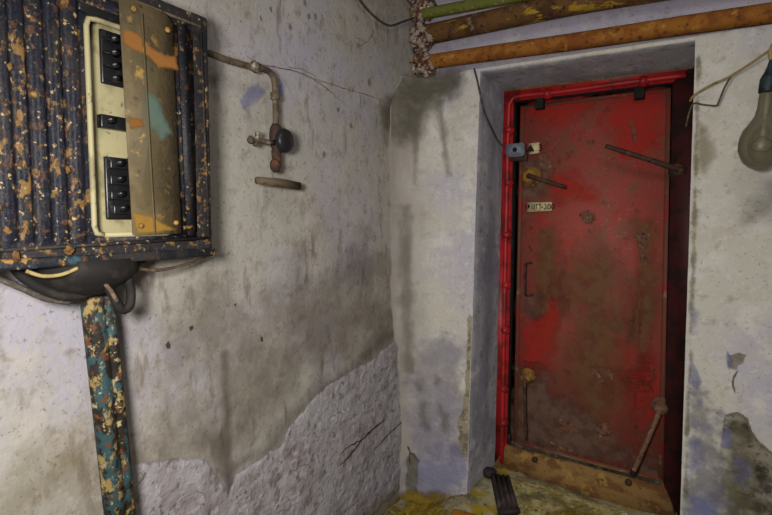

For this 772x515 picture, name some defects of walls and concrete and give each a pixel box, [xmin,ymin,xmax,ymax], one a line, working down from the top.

damp [383,73,459,138]
peeling [728,353,743,392]
peeling [132,342,419,515]
crack [337,419,402,469]
peeling [686,388,772,515]